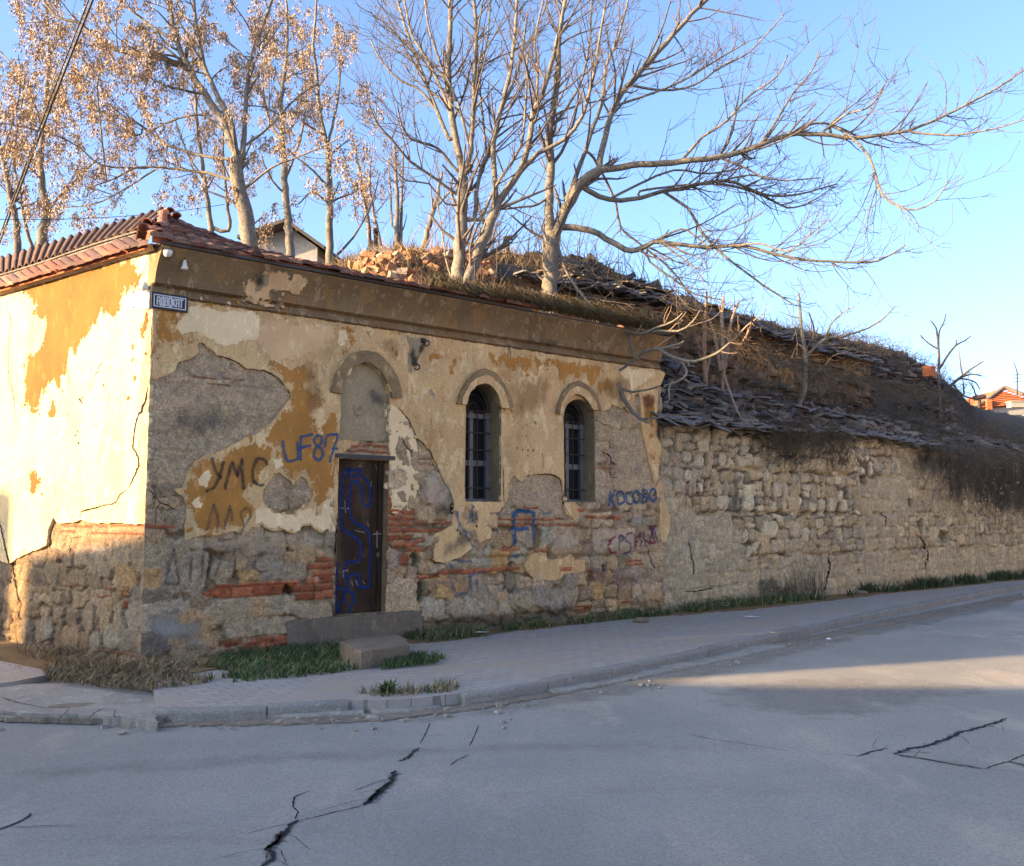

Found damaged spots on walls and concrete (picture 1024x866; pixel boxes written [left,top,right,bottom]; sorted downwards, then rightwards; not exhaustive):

peeling [22,258,143,418]
crack [0,388,175,622]
flaking render [111,271,360,537]
flaking render [383,404,470,541]
flaking render [488,352,655,517]